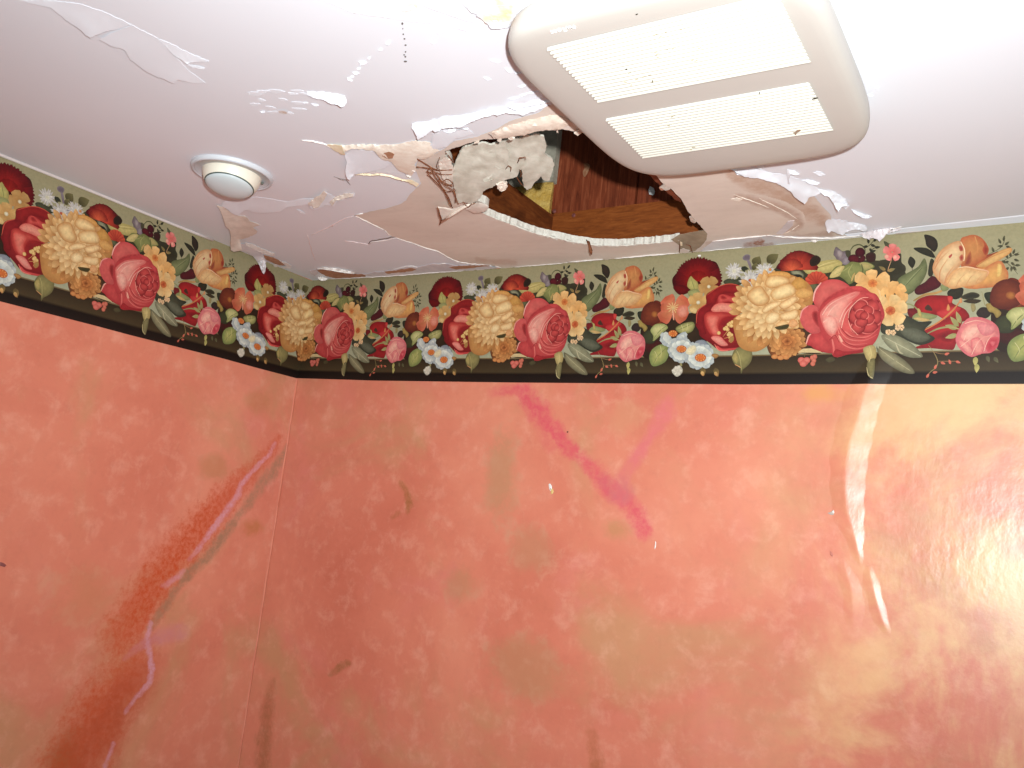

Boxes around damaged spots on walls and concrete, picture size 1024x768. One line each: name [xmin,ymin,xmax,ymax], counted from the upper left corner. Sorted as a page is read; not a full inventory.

peeling [20,0,207,83]
peeling [306,91,347,107]
peeling [222,191,355,216]
peeling [301,98,872,268]